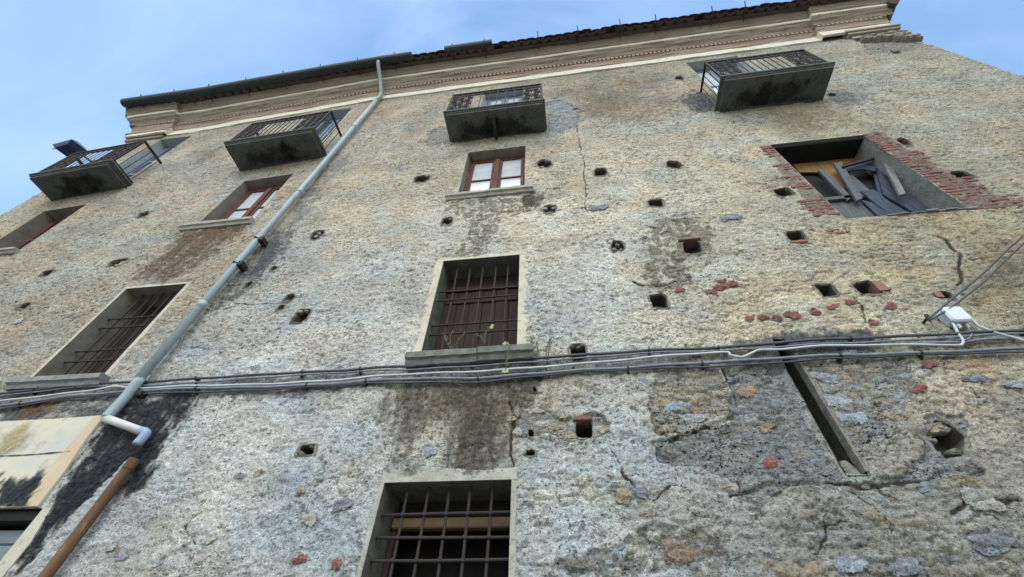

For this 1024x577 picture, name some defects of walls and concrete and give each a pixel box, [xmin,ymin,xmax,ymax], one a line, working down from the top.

flaking render [759,145,840,217]
flaking render [862,132,1024,210]
crack [937,237,981,286]
flaking render [638,350,1007,512]
water stain [0,390,199,575]